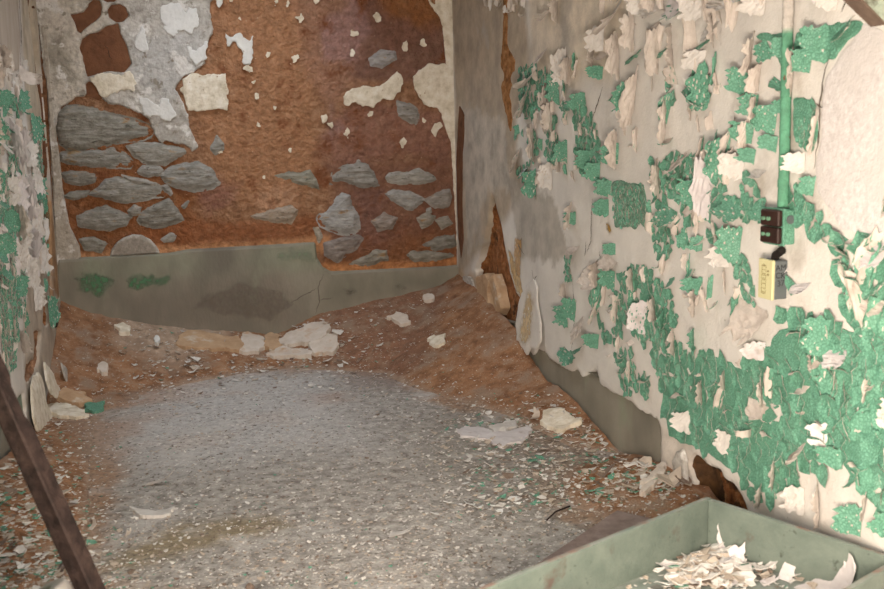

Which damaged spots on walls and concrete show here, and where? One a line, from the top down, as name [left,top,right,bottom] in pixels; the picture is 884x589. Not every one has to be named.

peeling [0,44,68,432]
peeling [481,0,884,538]
peeling [656,559,709,585]
peeling [717,524,745,586]